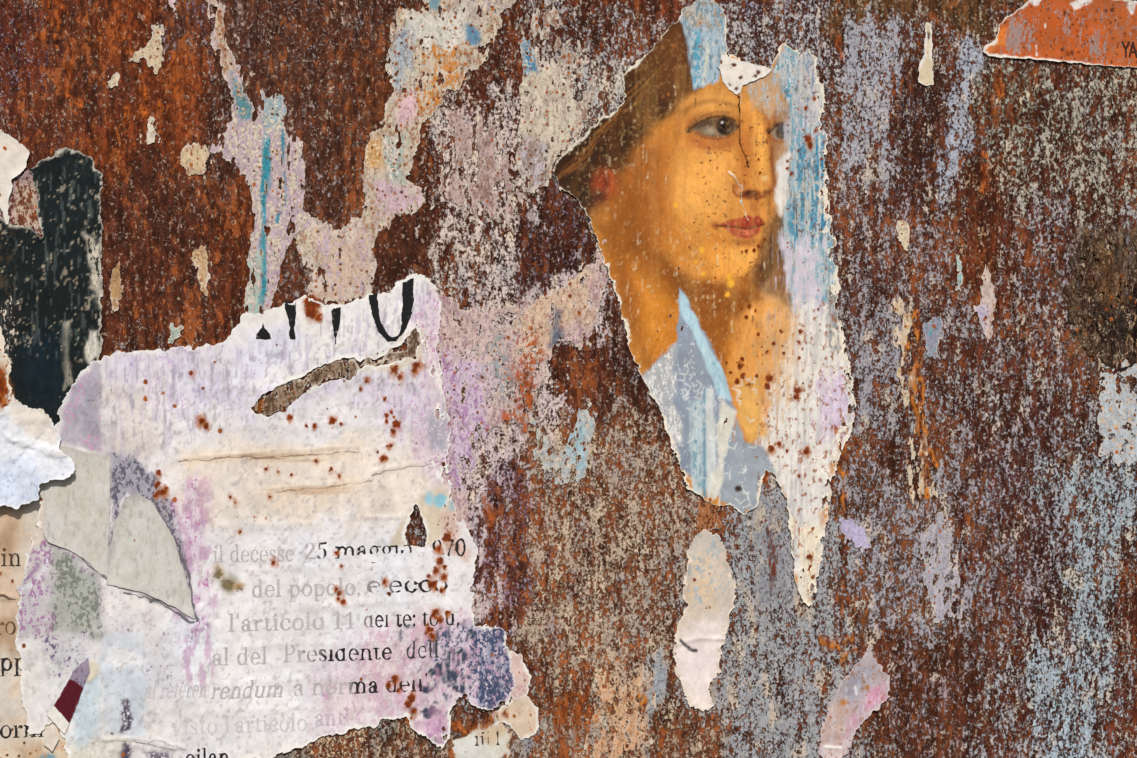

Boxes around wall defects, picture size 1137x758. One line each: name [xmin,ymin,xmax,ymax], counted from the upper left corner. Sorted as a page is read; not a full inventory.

peeling [180,0,605,314]
peeling [0,170,42,235]
peeling [109,261,124,312]
corrosion [1063,222,1137,374]
peeling [168,322,184,344]
peeling [255,239,607,529]
corrosion [519,369,533,433]
corrosion [905,310,938,499]
corrosion [766,527,776,592]
peeling [839,518,872,553]
corrosion [451,710,508,735]
corrosion [551,688,588,758]